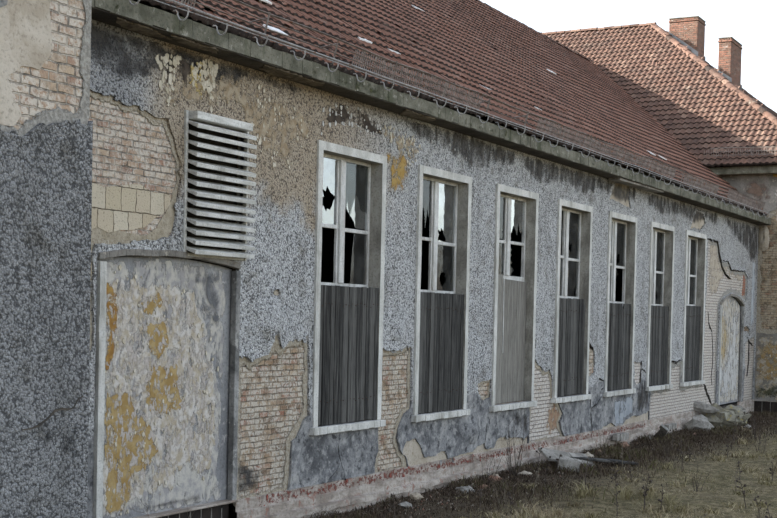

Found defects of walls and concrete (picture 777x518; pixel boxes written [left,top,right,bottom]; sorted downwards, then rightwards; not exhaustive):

spalling [0,0,184,252]
peeling [116,17,312,169]
spalling [259,65,325,86]
peeling [103,258,225,517]
spalling [233,209,777,507]
crack [707,238,745,279]